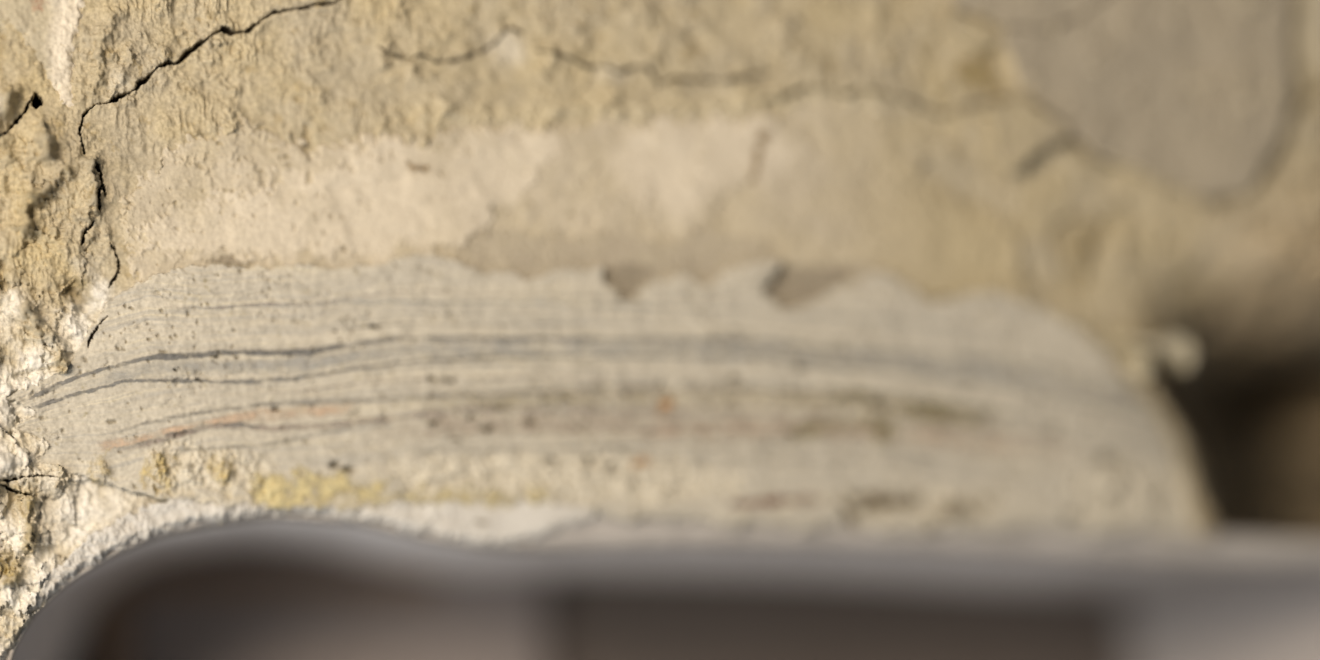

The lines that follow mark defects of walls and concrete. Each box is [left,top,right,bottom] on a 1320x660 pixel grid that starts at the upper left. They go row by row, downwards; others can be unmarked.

crack [377,13,773,90]
crack [0,100,31,137]
crack [78,0,339,346]
spalling [211,256,242,267]
peeling [718,260,780,287]
spalling [1093,335,1194,382]